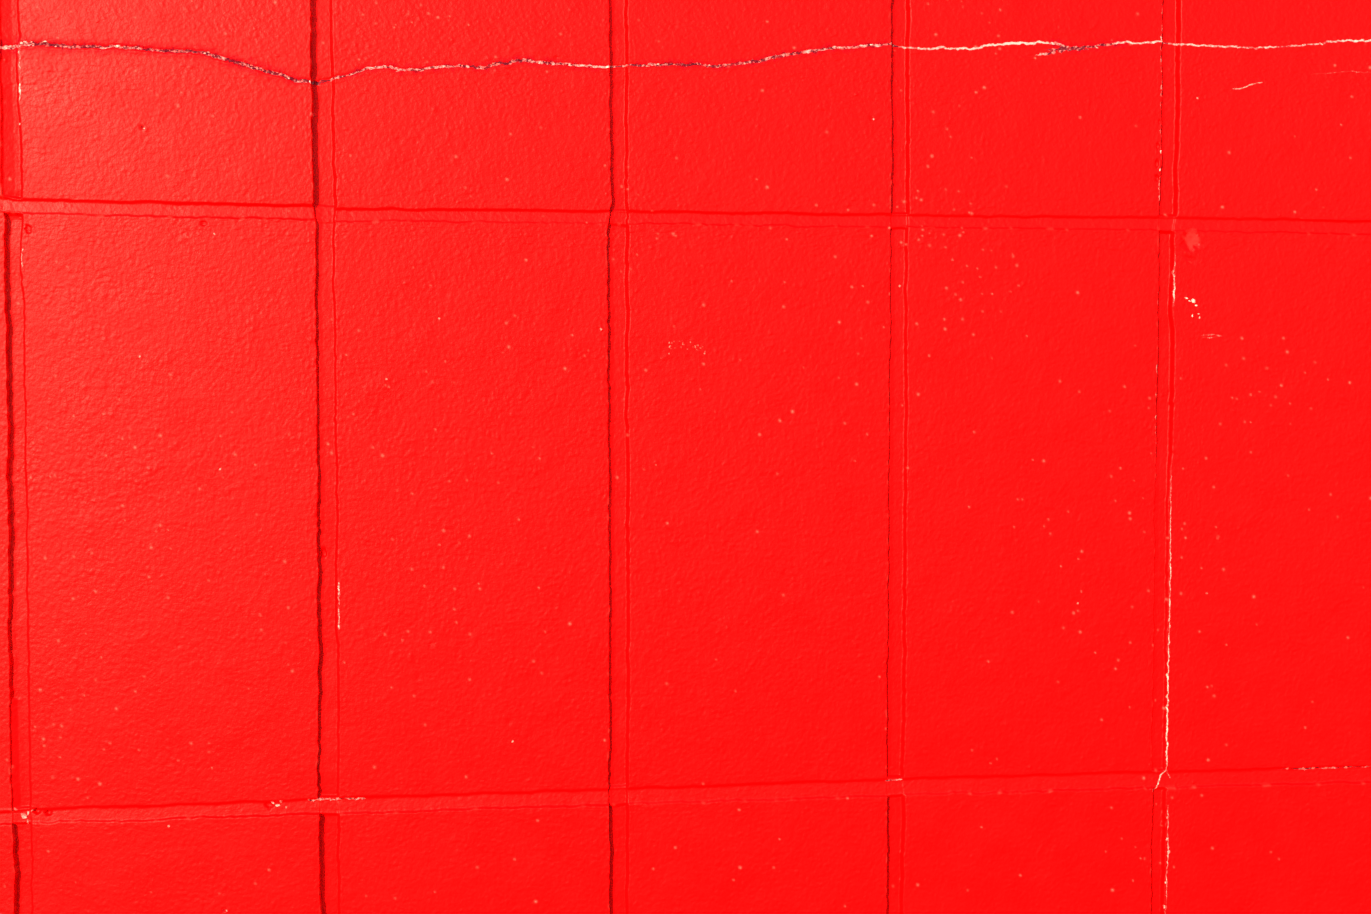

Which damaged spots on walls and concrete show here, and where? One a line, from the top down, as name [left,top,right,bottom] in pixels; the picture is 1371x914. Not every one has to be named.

crack [0,39,1371,125]